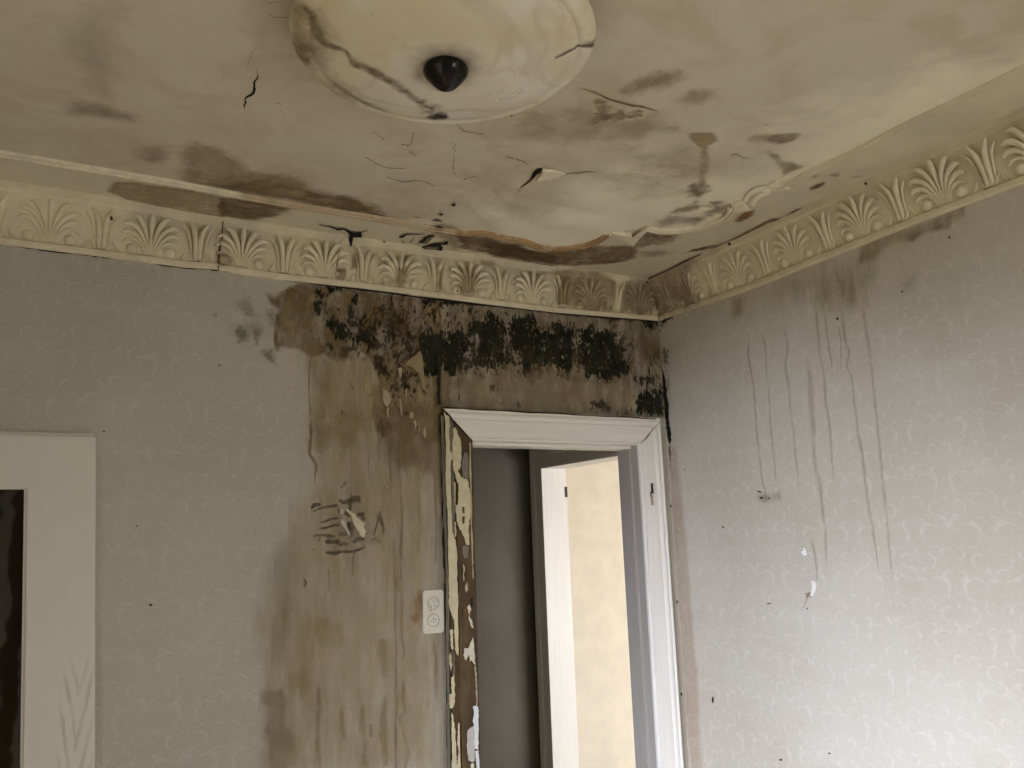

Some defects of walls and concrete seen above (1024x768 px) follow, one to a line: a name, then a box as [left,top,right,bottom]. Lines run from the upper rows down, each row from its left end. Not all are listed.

crack [243,51,282,110]
damp [111,148,384,220]
crack [365,124,484,186]
crack [507,157,595,196]
damp [680,185,704,211]
damp [691,133,715,148]
crack [319,224,365,278]
damp [265,209,801,683]
flaking render [340,508,366,538]
peeling [440,413,480,768]